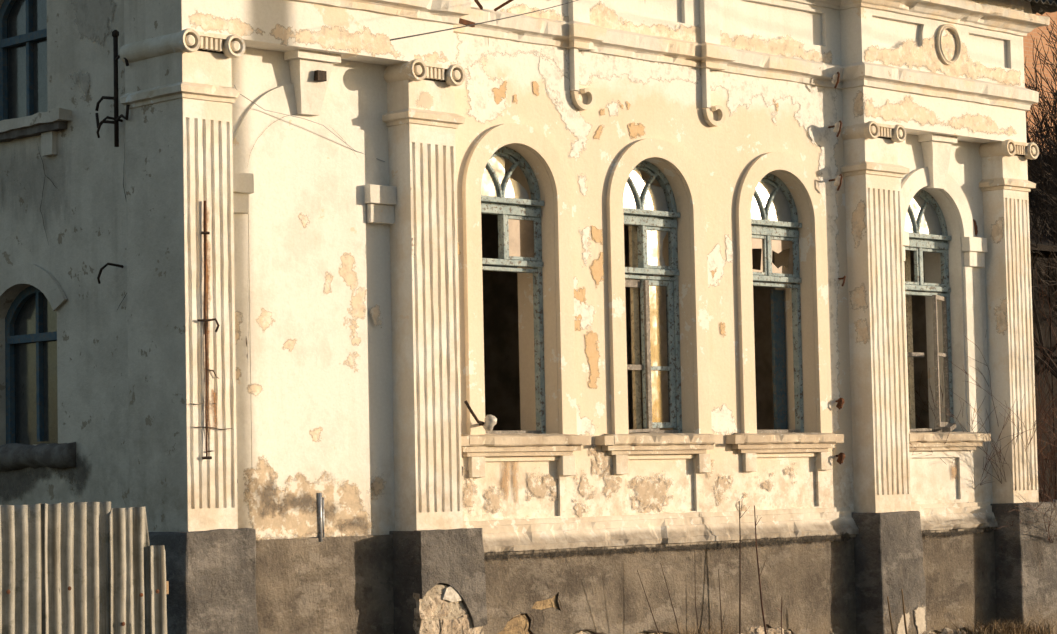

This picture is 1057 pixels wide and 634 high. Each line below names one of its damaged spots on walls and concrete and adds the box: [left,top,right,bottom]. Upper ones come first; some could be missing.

peeling [189,11,401,58]
peeling [720,30,832,64]
peeling [865,34,1021,86]
peeling [466,60,518,124]
peeling [853,90,1017,135]
peeling [707,234,733,287]
peeling [323,253,382,371]
peeling [574,226,605,389]
peeling [573,405,673,517]
leakage [244,457,386,540]
spalling [413,585,484,634]
spalling [498,594,559,634]